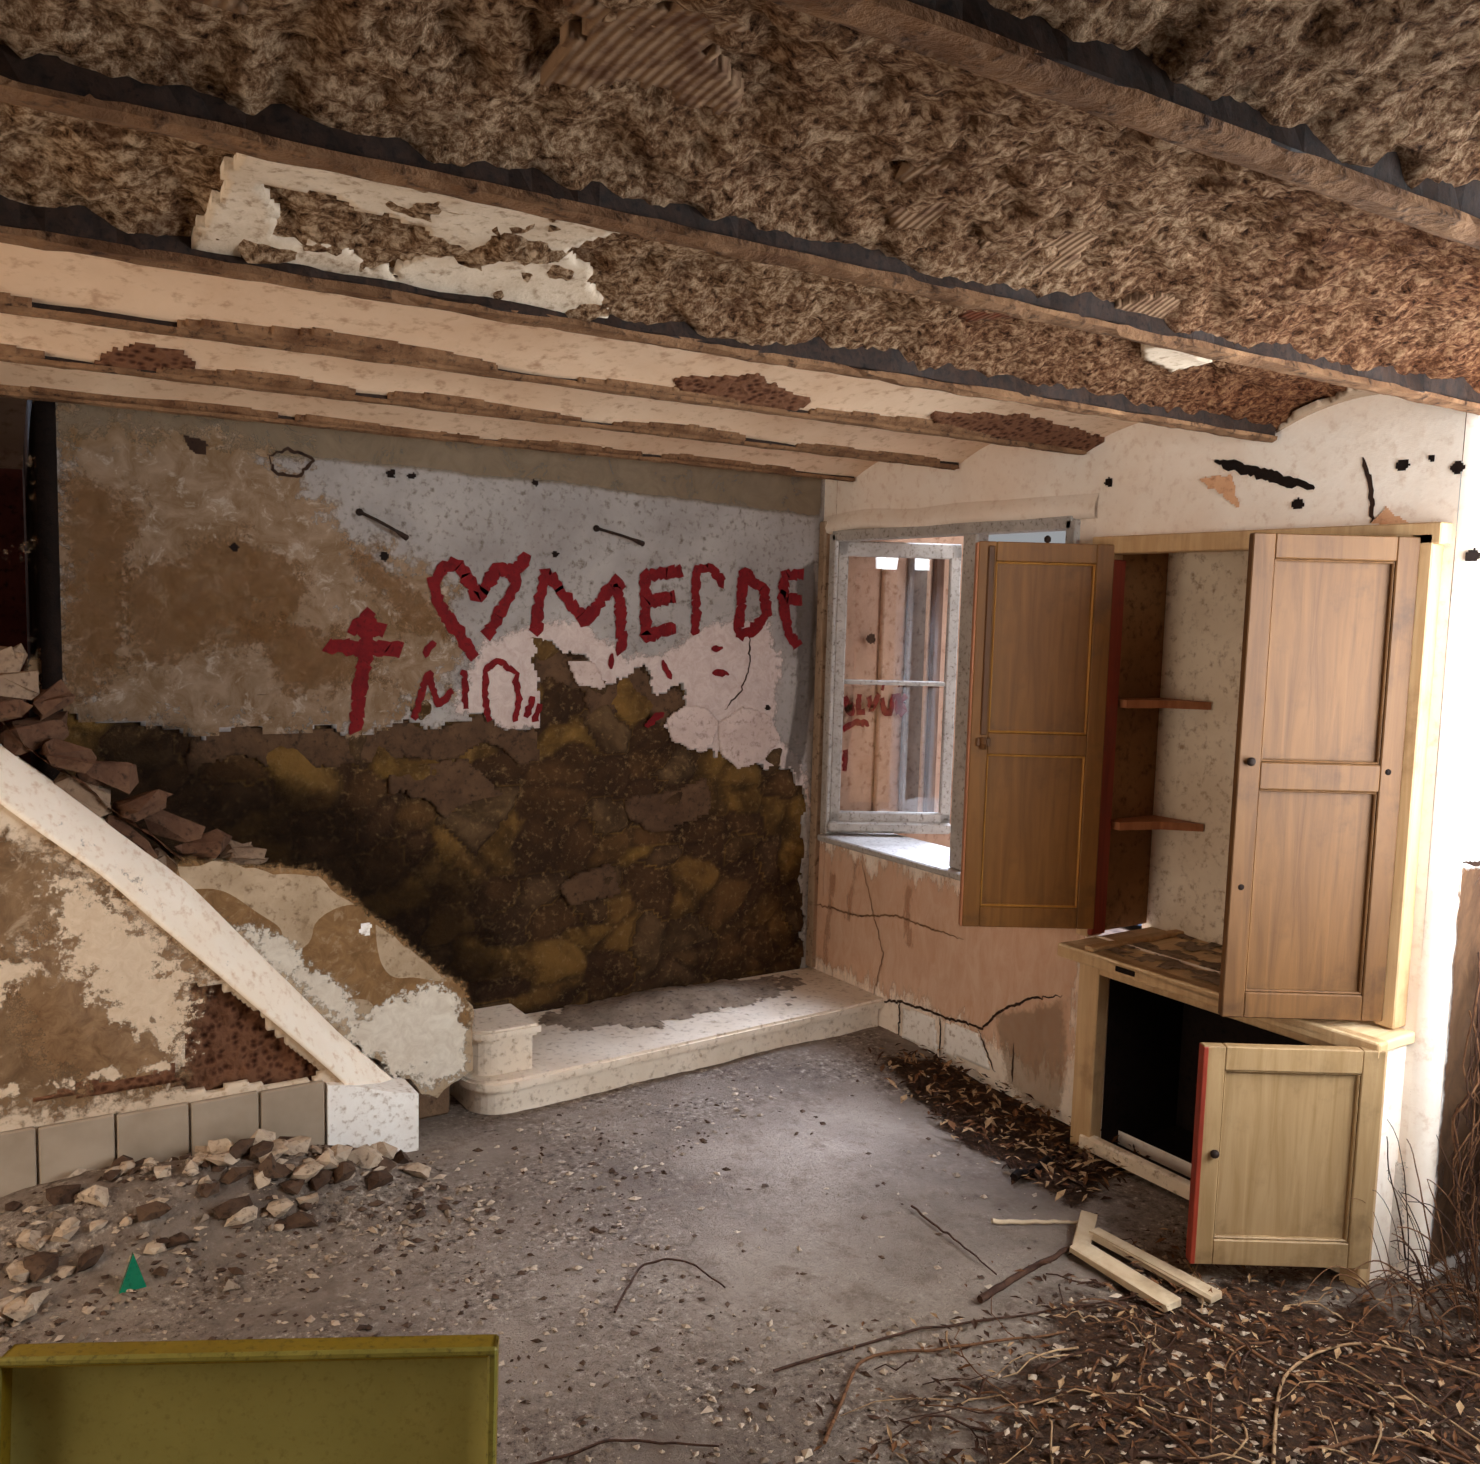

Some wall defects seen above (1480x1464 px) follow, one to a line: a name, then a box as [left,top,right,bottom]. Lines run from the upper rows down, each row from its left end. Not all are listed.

peeling [191,153,620,318]
spalling [0,292,32,309]
spalling [0,343,45,359]
spalling [94,342,356,395]
spalling [177,318,498,372]
peeling [1140,344,1212,372]
spalling [387,391,582,421]
spalling [577,373,1105,453]
spalling [795,443,940,464]
flaking render [64,619,811,1014]
peeling [0,855,320,1102]
crack [817,857,1062,1081]